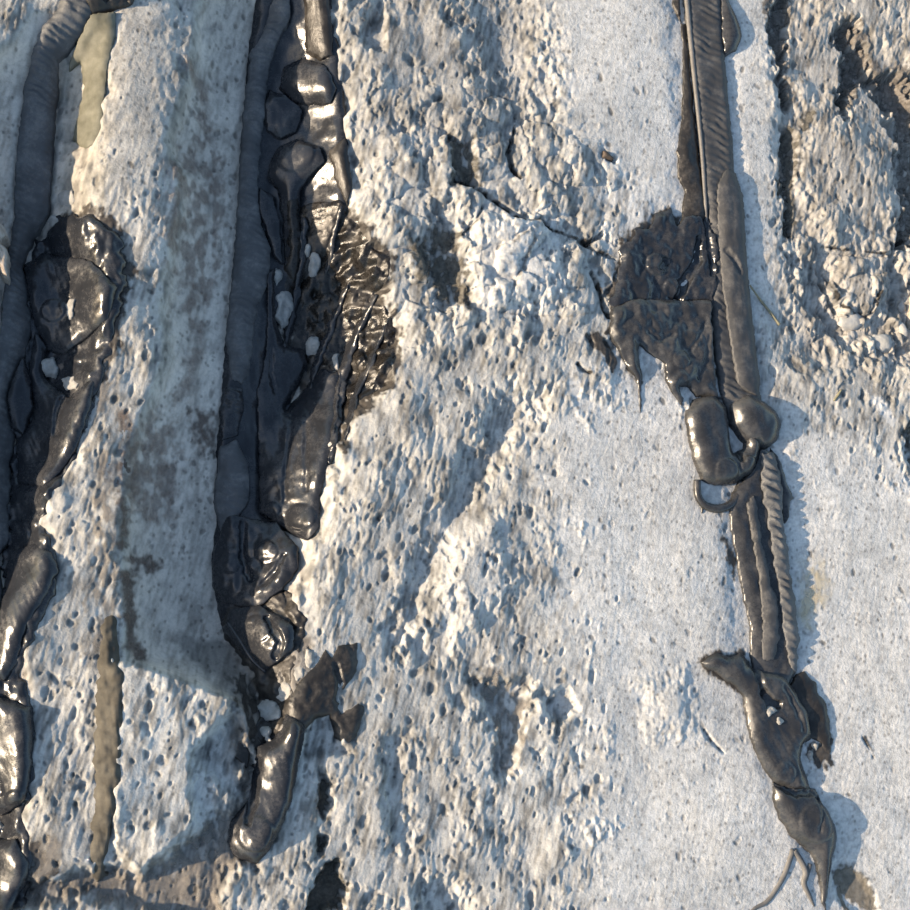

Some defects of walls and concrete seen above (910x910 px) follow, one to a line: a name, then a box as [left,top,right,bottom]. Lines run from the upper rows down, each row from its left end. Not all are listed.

spalling [762,0,795,108]
crack [506,130,522,179]
spalling [775,111,816,238]
spalling [835,12,910,243]
crack [453,178,610,318]
spalling [900,427,910,465]
spalling [306,837,349,910]